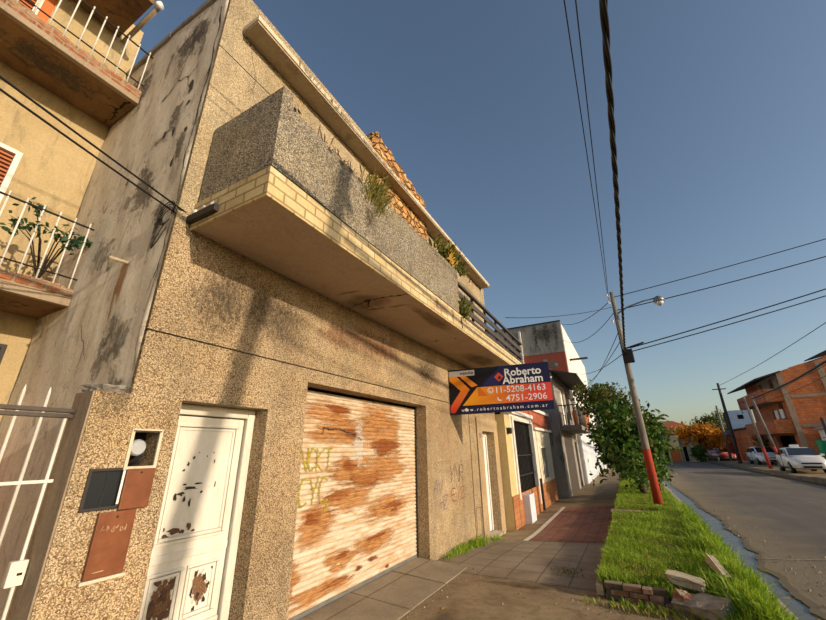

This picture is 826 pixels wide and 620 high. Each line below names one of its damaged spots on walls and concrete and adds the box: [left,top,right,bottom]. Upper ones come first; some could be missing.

leakage [165,10,213,79]
crack [101,101,131,123]
leakage [133,65,154,112]
crack [132,6,222,370]
crack [348,294,405,310]
leakage [90,315,132,381]
peeling [173,482,203,506]
rust [297,399,407,549]
peeling [159,523,195,539]
peeling [146,576,176,620]
peeling [189,566,213,611]
rust [288,527,394,614]